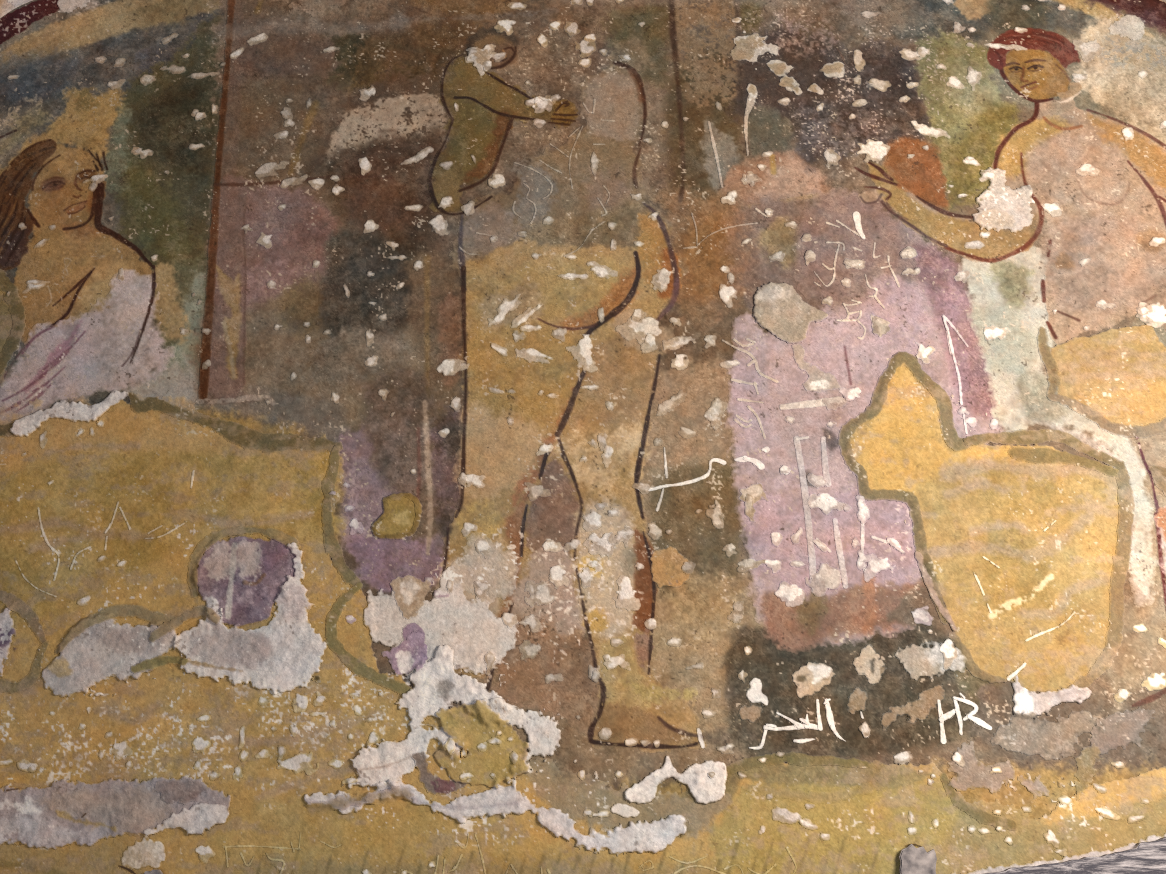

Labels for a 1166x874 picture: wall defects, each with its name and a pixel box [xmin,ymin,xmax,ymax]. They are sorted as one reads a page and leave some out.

peeling [461,2,528,76]
peeling [537,20,631,68]
peeling [729,17,919,120]
peeling [898,46,982,91]
peeling [856,139,891,164]
peeling [907,120,951,159]
flaking render [948,156,1062,250]
peeling [488,294,599,391]
peeling [597,307,717,371]
peeling [9,389,129,449]
peeling [130,500,747,857]
flaking render [893,671,1166,824]